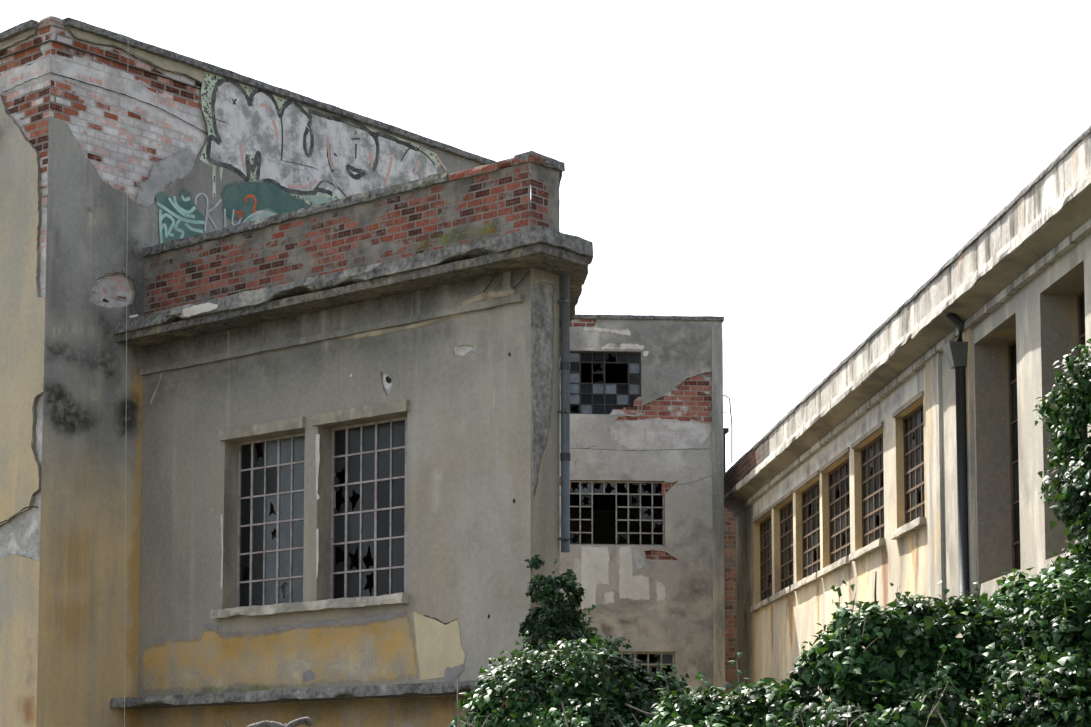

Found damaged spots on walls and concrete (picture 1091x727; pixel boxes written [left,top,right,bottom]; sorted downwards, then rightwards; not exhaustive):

spalling [0,17,209,298]
spalling [32,391,43,477]
damp [119,400,137,432]
spalling [609,371,712,451]
spalling [0,491,41,561]
spalling [644,550,678,560]
spalling [662,480,679,495]
peeling [142,611,465,692]